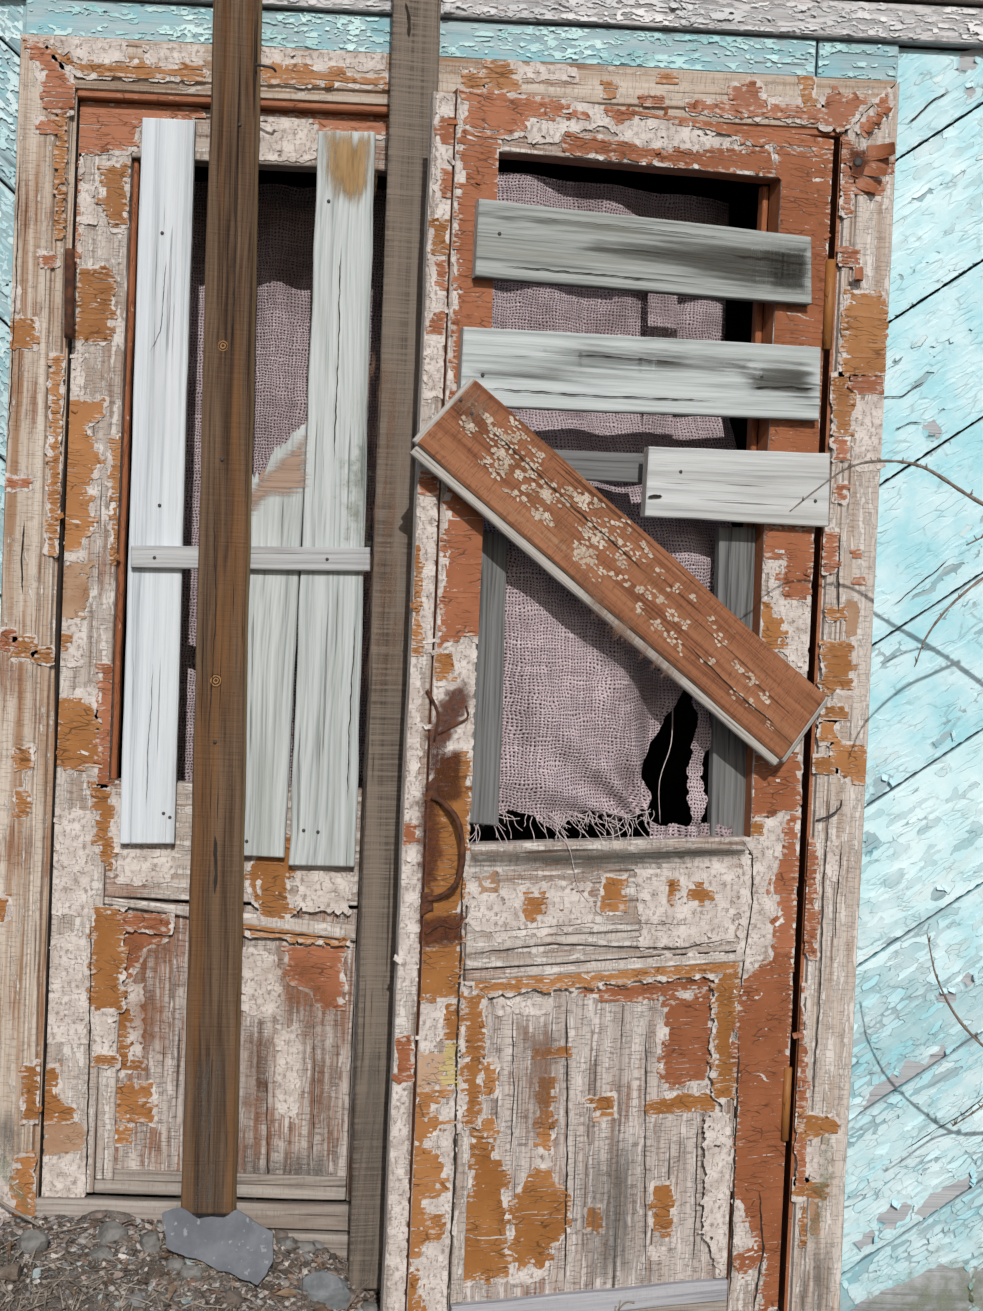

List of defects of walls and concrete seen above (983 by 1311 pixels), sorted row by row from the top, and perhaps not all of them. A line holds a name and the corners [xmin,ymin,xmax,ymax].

peeling [0,36,209,666]
peeling [424,59,898,469]
peeling [410,470,483,682]
peeling [11,742,36,819]
peeling [56,662,124,877]
rust [418,687,471,892]
peeling [78,905,175,1147]
peeling [242,832,351,1013]
peeling [392,524,896,1311]
peeling [0,1059,381,1311]
peeling [849,1168,978,1253]
peeling [850,1263,983,1311]